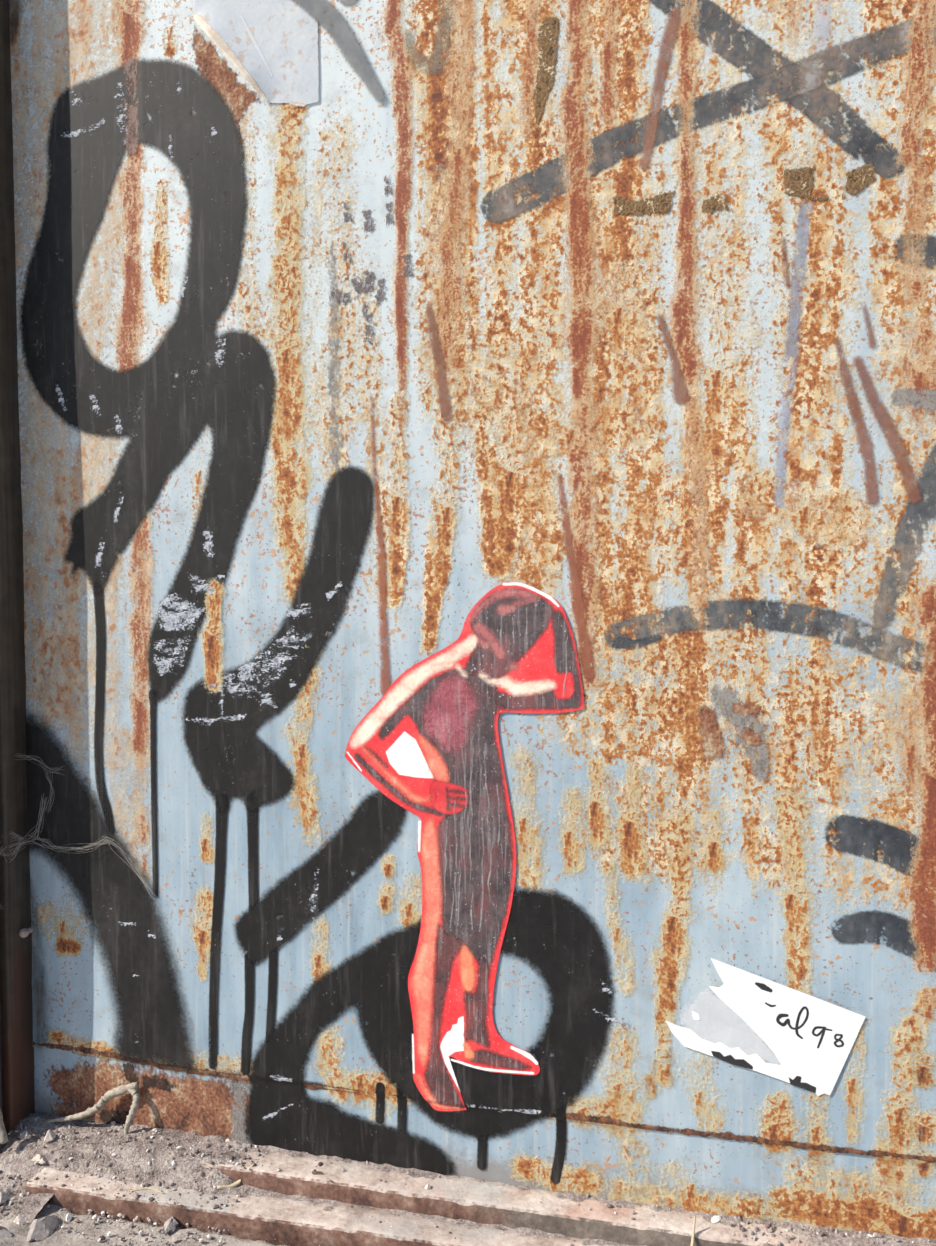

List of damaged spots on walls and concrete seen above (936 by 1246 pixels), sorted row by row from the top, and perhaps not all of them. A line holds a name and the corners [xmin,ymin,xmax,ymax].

rust [9,0,170,372]
rust [163,6,179,59]
rust [18,340,154,878]
rust [189,0,936,1239]
rust [32,1029,252,1143]